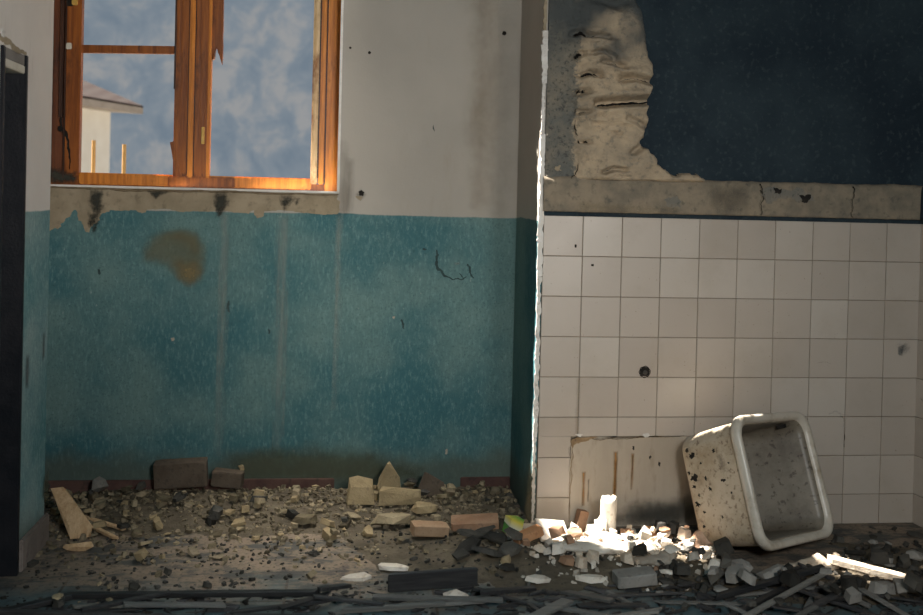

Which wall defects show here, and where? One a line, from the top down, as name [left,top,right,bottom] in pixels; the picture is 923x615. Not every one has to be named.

peeling [50,186,340,232]
crack [435,250,474,280]
peeling [568,433,697,528]